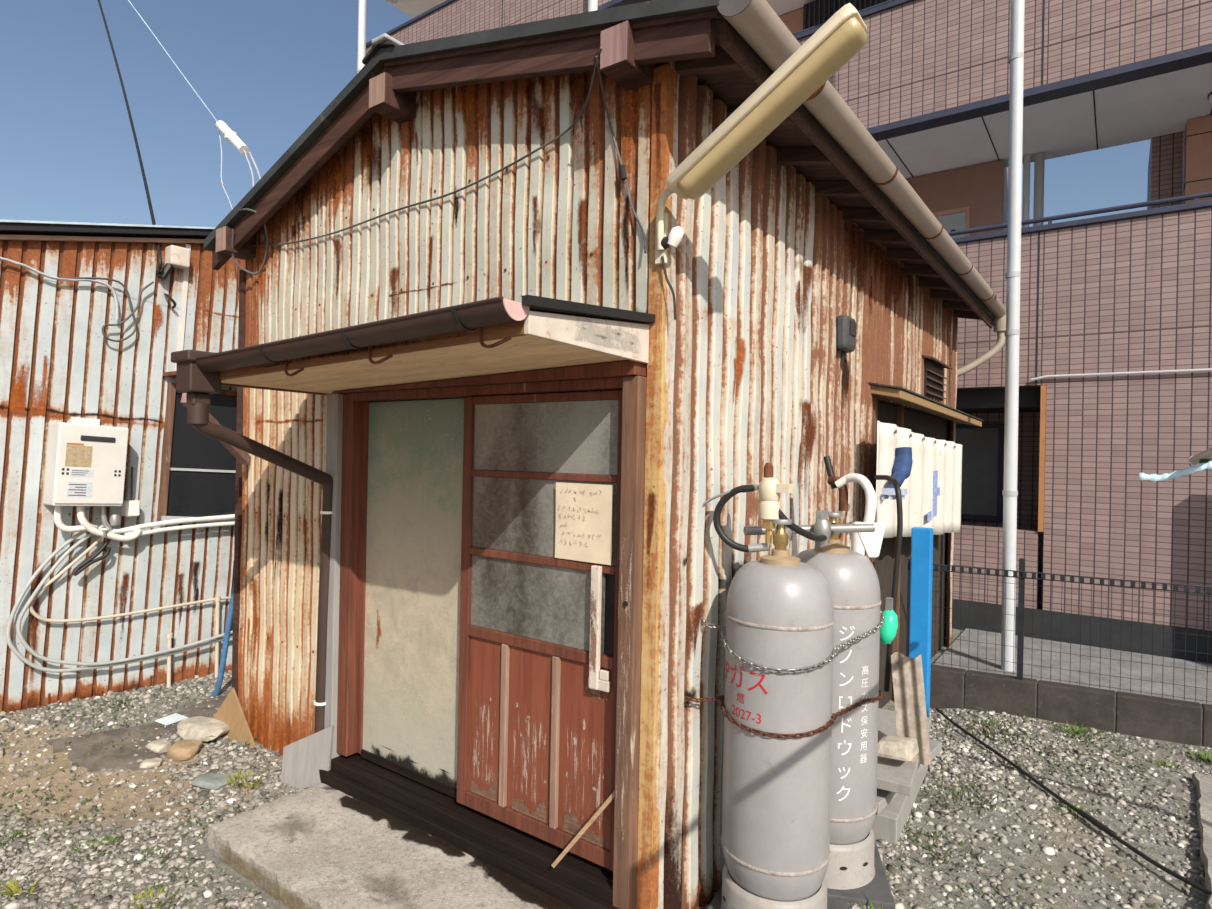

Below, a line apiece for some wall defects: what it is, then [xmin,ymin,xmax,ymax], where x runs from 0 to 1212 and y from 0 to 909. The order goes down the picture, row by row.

rust [578,200,587,288]
rust [796,263,812,338]
rust [733,338,745,401]
rust [798,401,816,485]
rust [30,566,43,673]
rust [177,562,200,624]
rust [686,603,703,652]
leakage [373,747,457,789]
peeling [471,698,497,802]
peeling [511,703,546,823]
peeling [563,639,630,847]
rust [663,795,713,909]